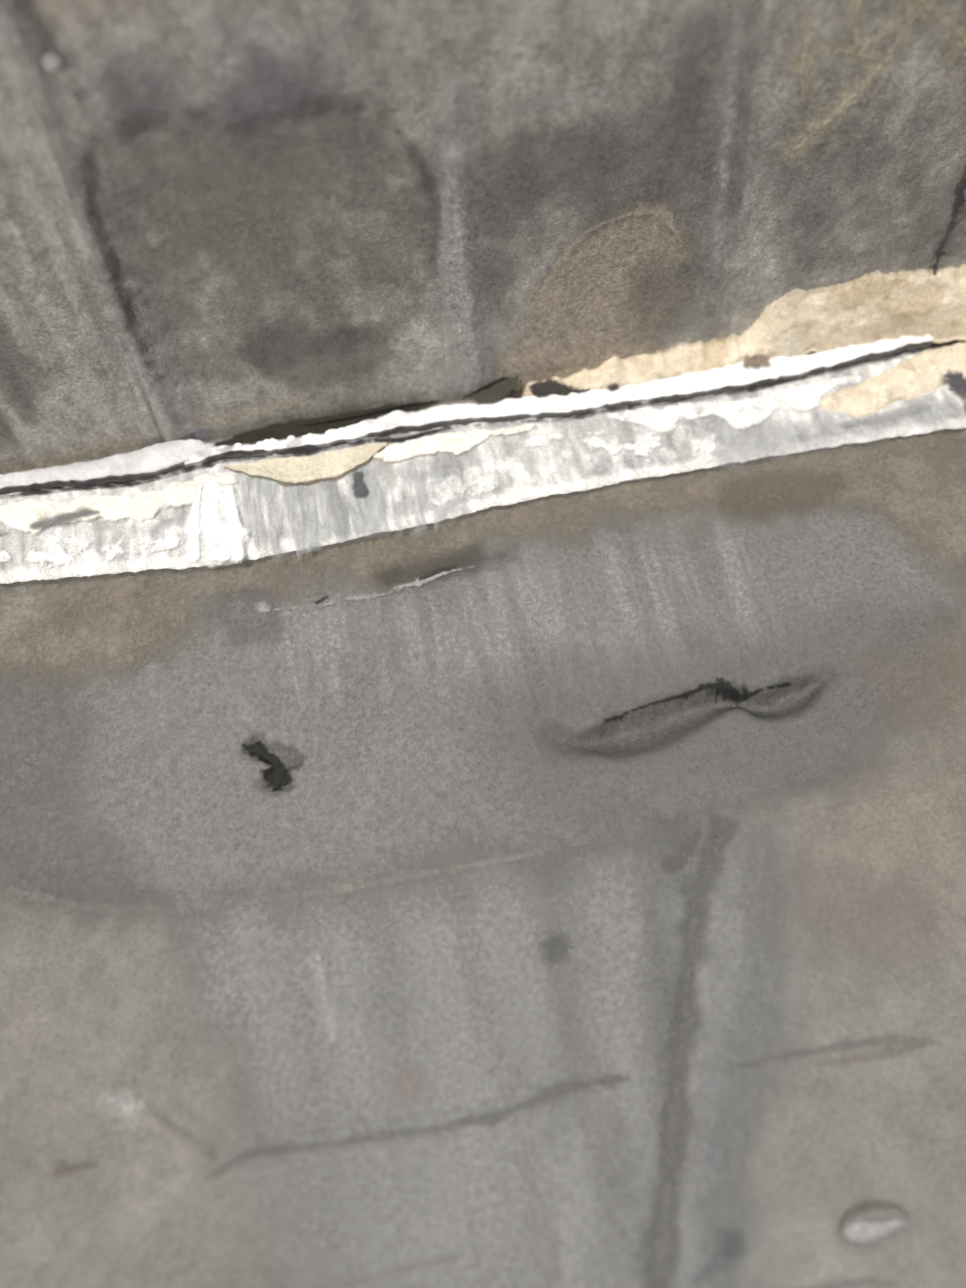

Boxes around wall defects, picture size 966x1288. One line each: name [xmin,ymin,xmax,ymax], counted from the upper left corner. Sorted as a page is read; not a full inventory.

water stain [85,55,437,383]
crack [929,167,966,275]
crack [0,341,956,498]
spalling [463,376,518,404]
peeling [583,376,861,462]
peeling [0,423,563,533]
peeling [27,539,124,567]
peeling [256,565,475,612]
water stain [0,404,966,702]
spalling [242,737,304,791]
water stain [194,818,787,1288]
crack [526,1076,629,1106]